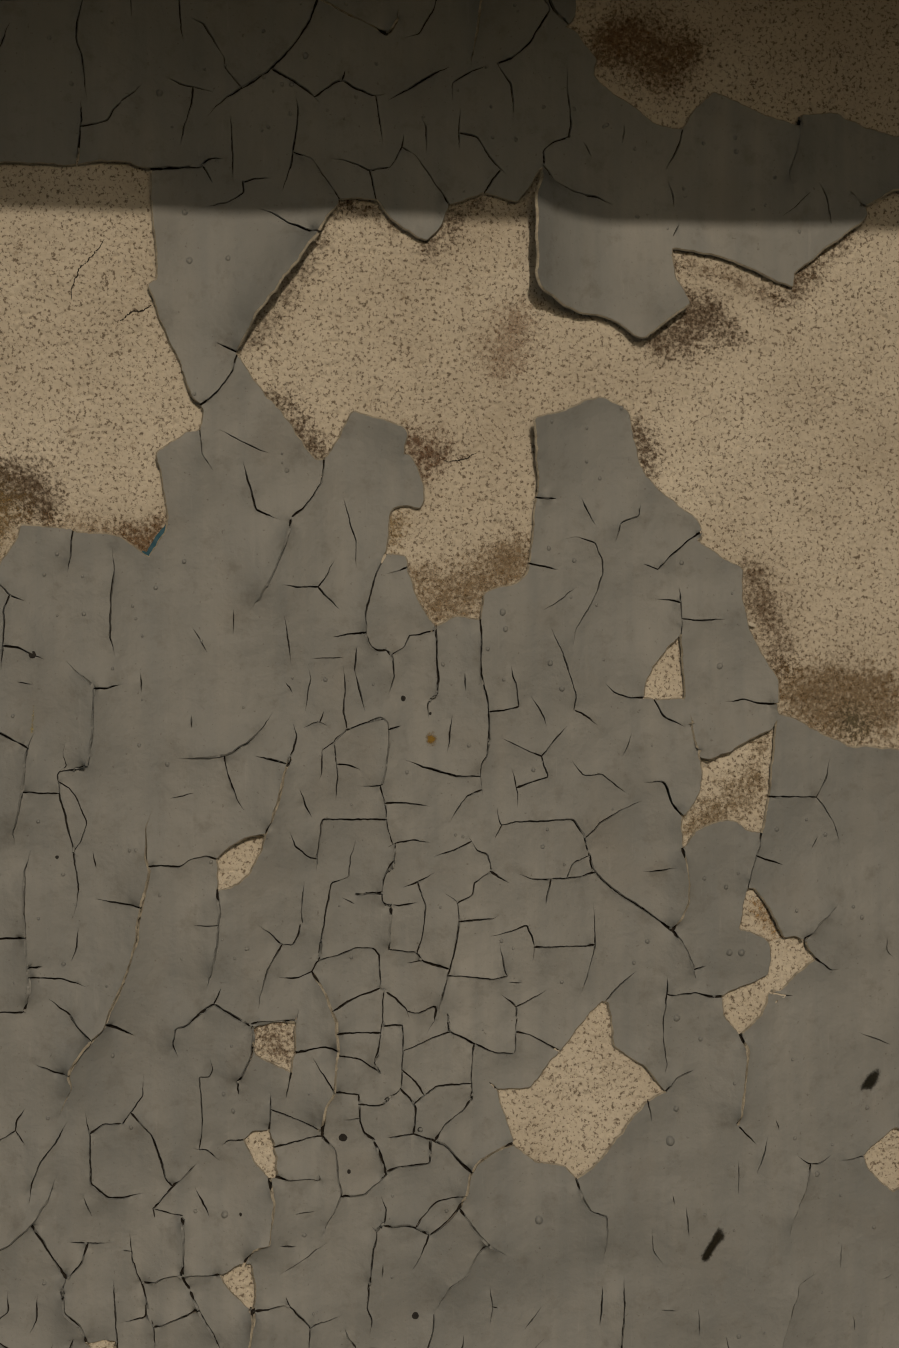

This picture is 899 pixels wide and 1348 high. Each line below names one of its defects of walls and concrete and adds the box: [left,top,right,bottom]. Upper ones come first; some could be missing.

crack [151,0,568,232]
water stain [586,4,711,100]
peeling [0,0,899,760]
water stain [0,458,68,554]
crack [645,532,722,621]
water stain [738,559,899,746]
peeling [130,757,304,1082]
crack [0,497,683,1348]
crack [665,966,722,1004]
peeling [586,697,842,1103]
peeling [183,1129,282,1309]
peeling [440,1000,663,1263]